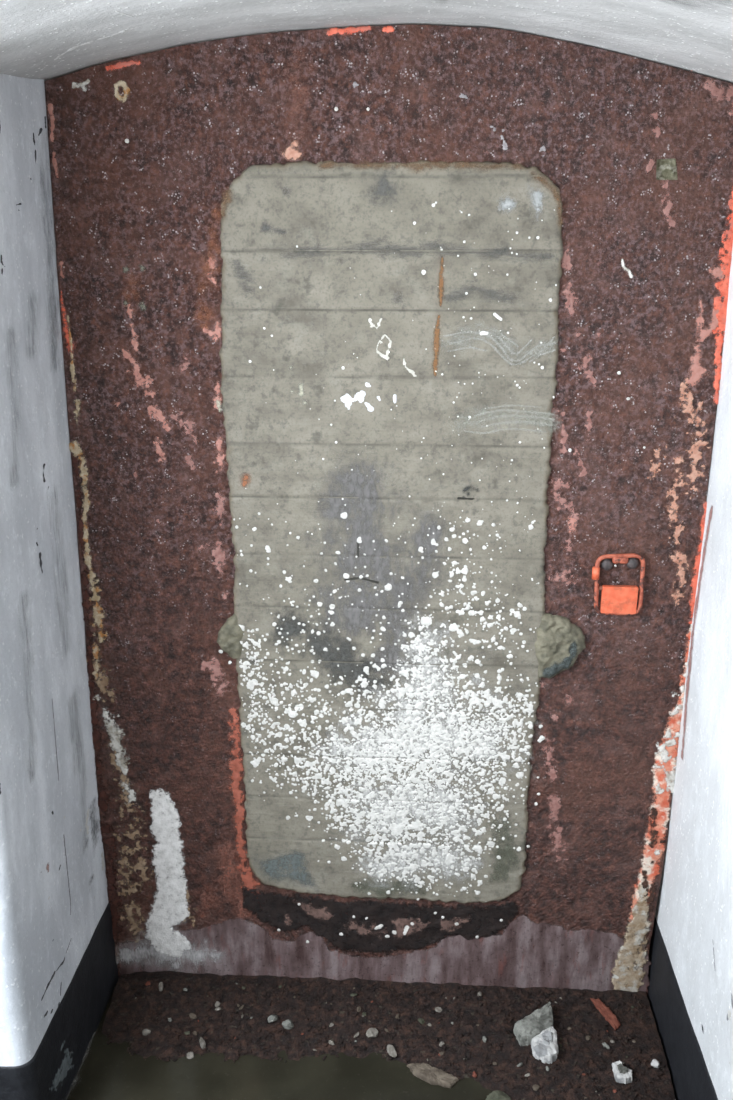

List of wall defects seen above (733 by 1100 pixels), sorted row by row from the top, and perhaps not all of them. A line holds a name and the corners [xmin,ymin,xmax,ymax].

crack [41,11,133,70]
peeling [282,140,304,160]
peeling [701,78,733,116]
leakage [69,441,108,680]
rust [71,453,123,964]
leakage [93,695,136,803]
leakage [120,788,220,968]
leakage [219,445,577,900]
peeling [109,189,733,995]
rust [641,861,655,912]
rust [649,807,665,848]
rust [681,506,713,759]